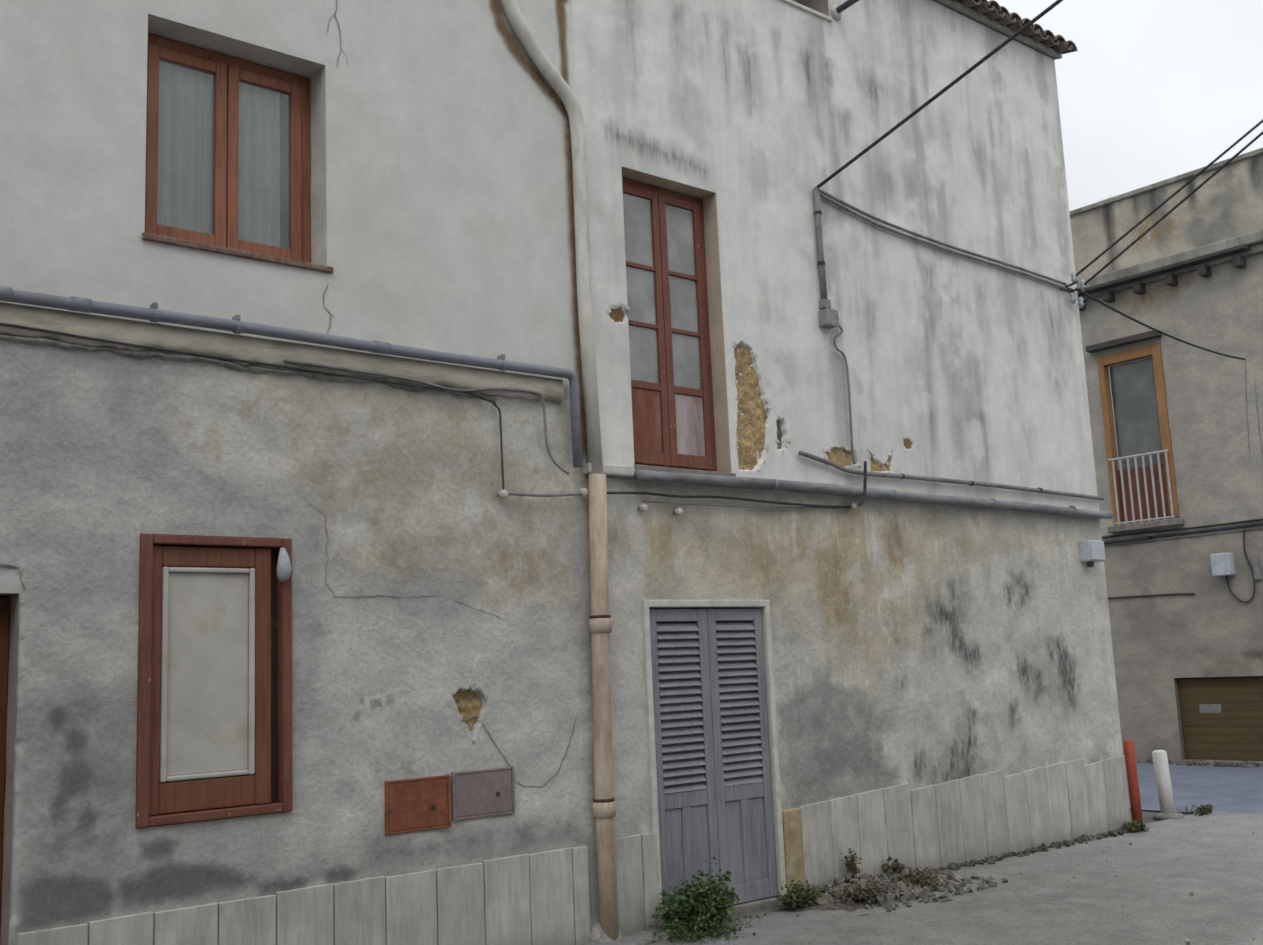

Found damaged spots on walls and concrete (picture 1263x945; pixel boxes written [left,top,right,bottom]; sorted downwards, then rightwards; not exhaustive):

crack [327,0,348,66]
spalling [607,307,630,322]
flaking render [732,341,791,471]
flaking render [823,444,892,473]
spalling [452,683,488,744]
leakage [23,841,244,926]
leakage [265,880,302,891]